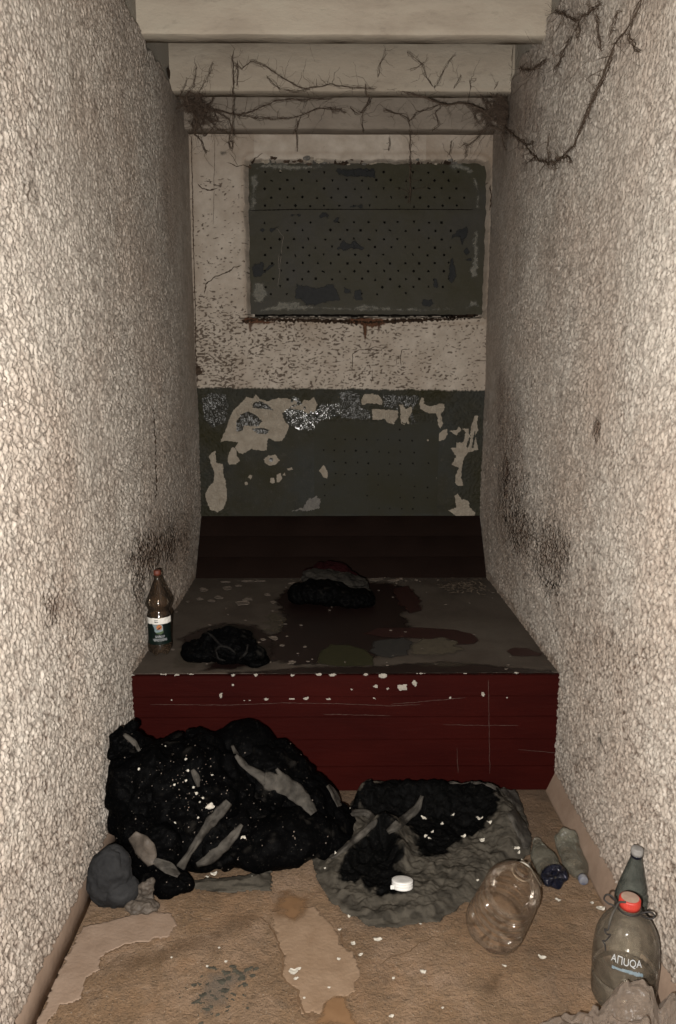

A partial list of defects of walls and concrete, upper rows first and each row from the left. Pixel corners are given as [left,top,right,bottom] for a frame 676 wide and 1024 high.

corrosion [350,317,387,339]
peeling [205,395,321,512]
peeling [361,394,478,516]